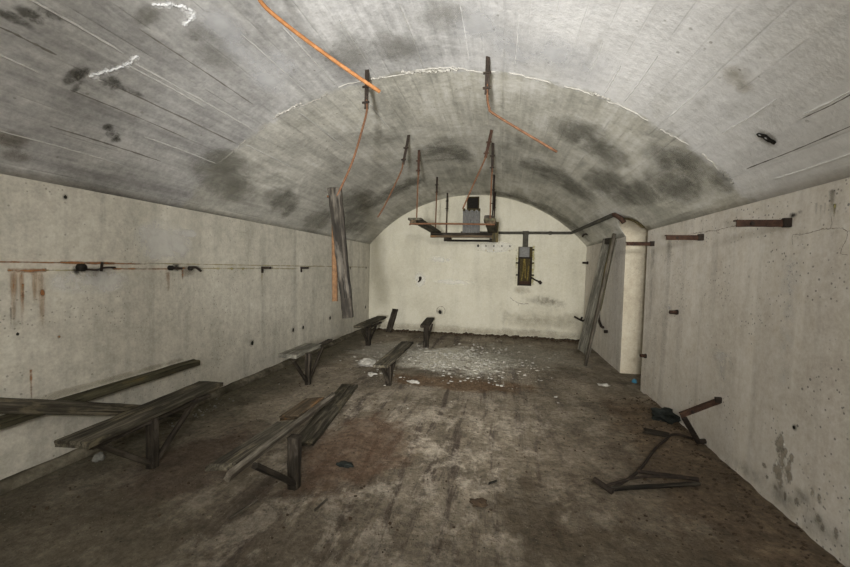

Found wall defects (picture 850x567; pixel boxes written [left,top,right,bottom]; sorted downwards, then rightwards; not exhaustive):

water stain [0,8,61,24]
crack [139,2,252,104]
crack [51,55,850,185]
corrosion [0,261,135,298]